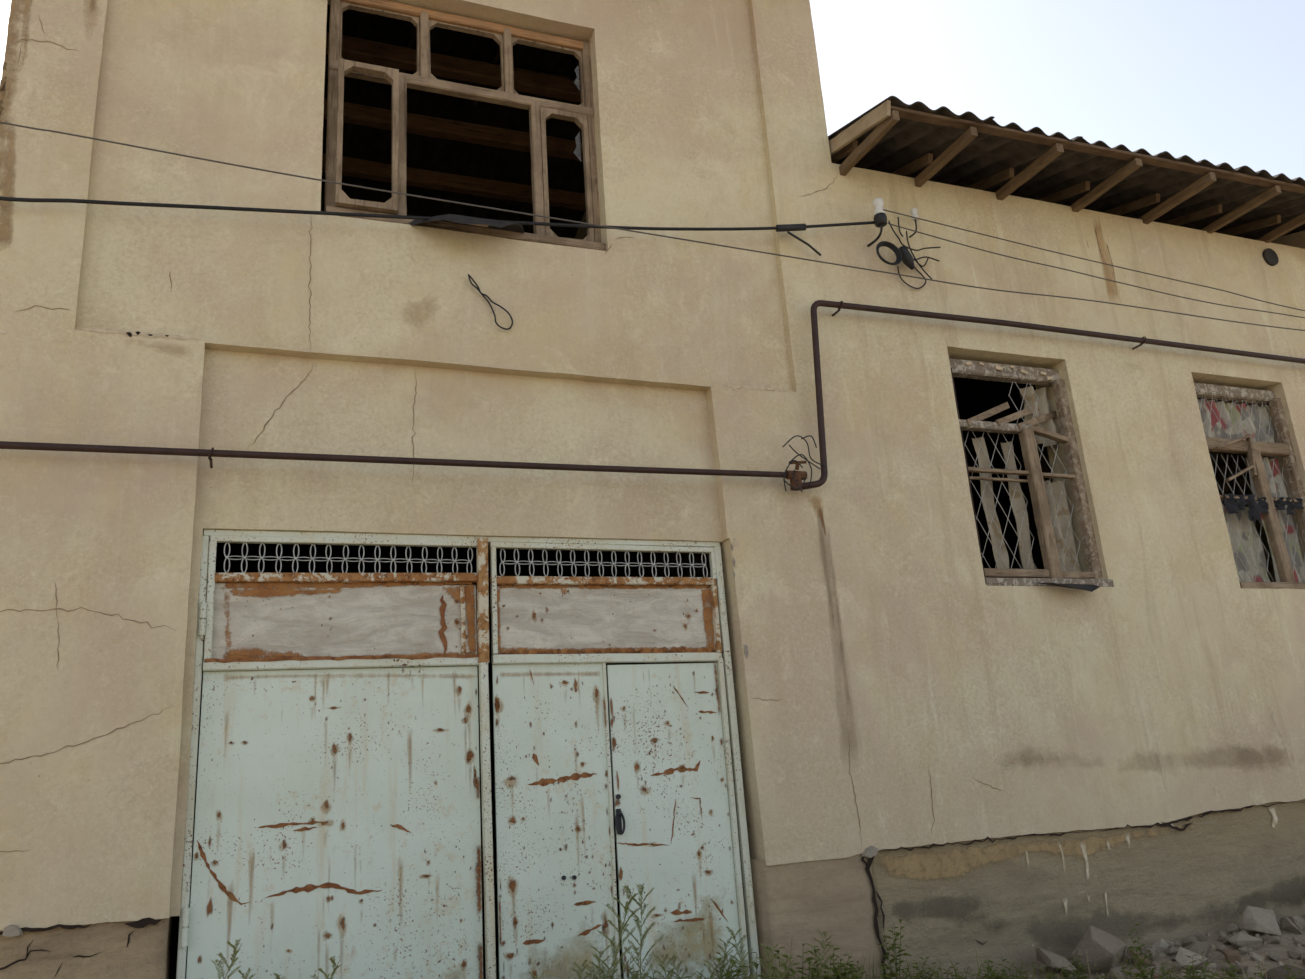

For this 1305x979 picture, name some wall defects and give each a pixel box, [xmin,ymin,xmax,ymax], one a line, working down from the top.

leakage [0,0,31,242]
crack [245,223,313,450]
crack [0,584,176,664]
rust [497,585,723,751]
crack [0,705,174,764]
crack [0,917,161,978]
rust [195,838,250,915]
rust [254,801,344,848]
rust [266,882,382,902]
rust [499,880,563,976]
rust [502,710,731,936]
flaking render [881,825,1191,880]